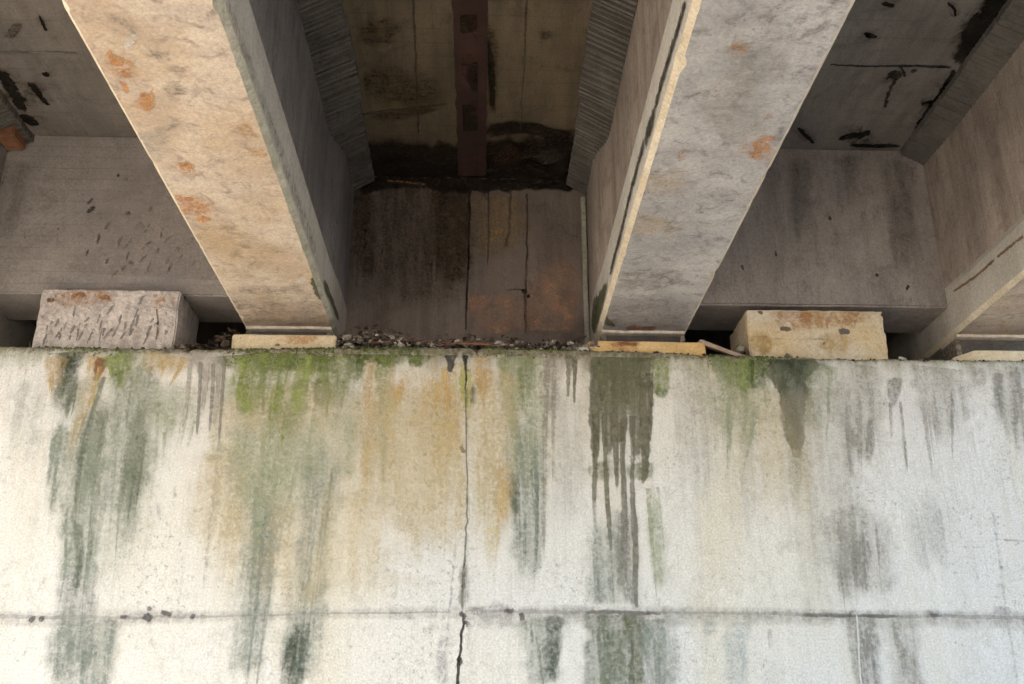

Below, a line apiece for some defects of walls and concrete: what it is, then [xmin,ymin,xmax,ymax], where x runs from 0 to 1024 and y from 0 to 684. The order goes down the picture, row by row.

rust [107,51,133,91]
leakage [350,121,574,300]
crack [465,191,530,330]
leakage [48,351,430,684]
crack [440,355,474,684]
leakage [500,356,577,553]
leakage [586,357,669,684]
leakage [712,358,832,457]
leakage [848,615,879,684]